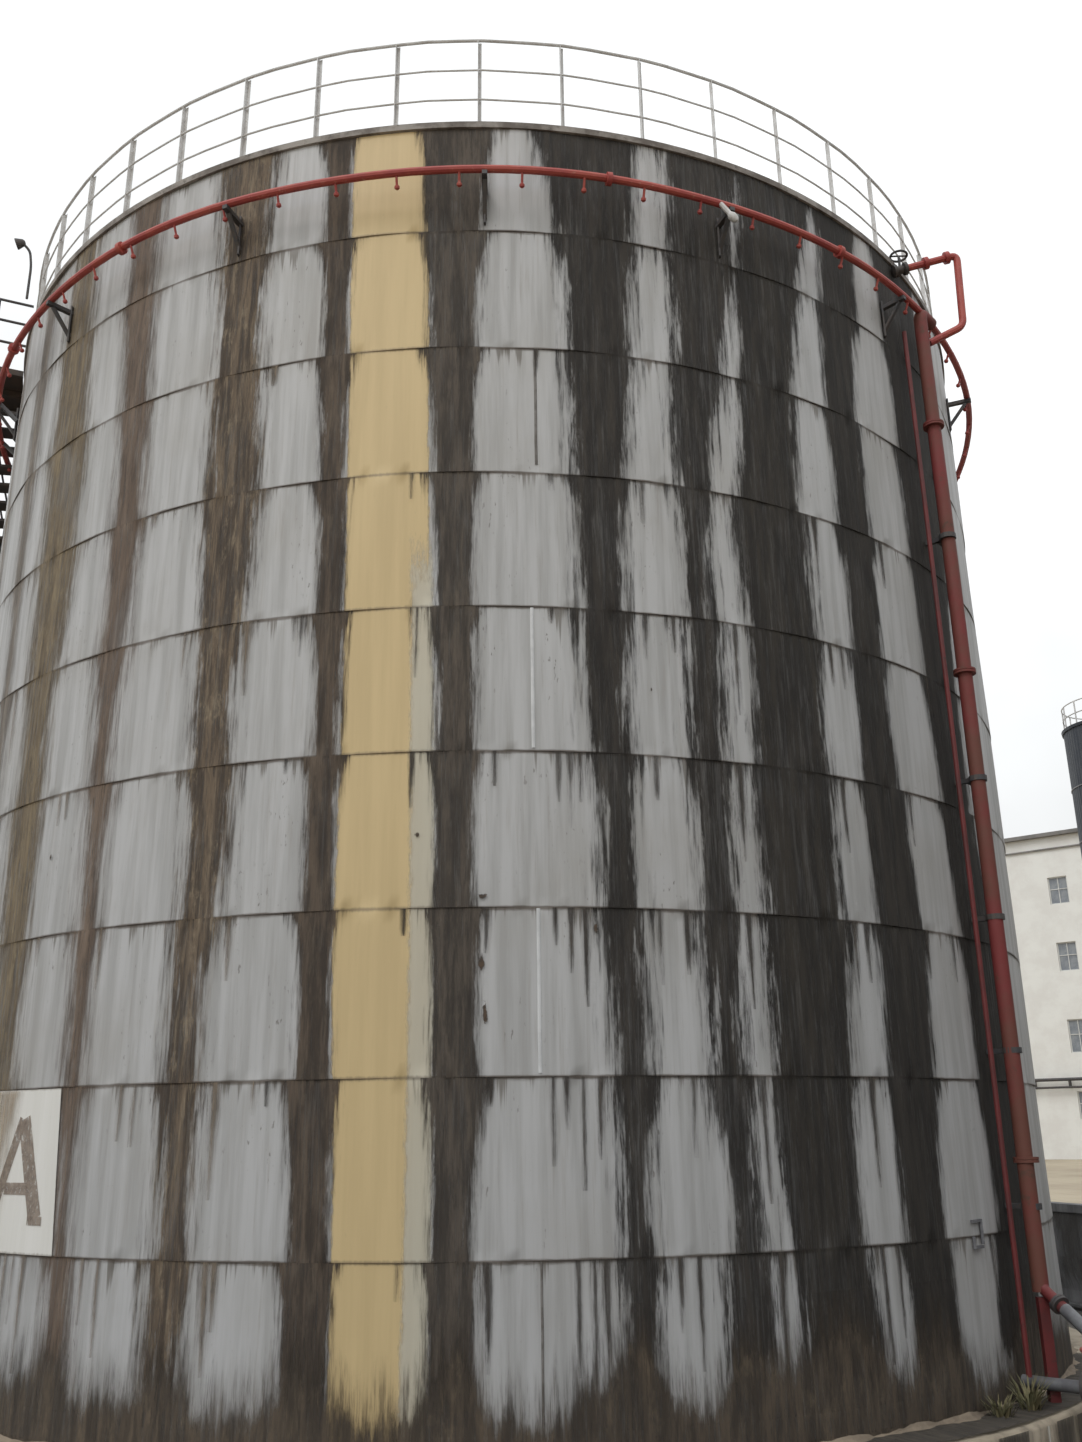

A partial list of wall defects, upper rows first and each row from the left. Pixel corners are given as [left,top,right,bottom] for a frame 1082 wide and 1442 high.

damp [0,193,170,1372]
damp [133,152,282,1393]
damp [252,137,359,1405]
damp [401,129,496,1399]
damp [527,130,1039,1380]